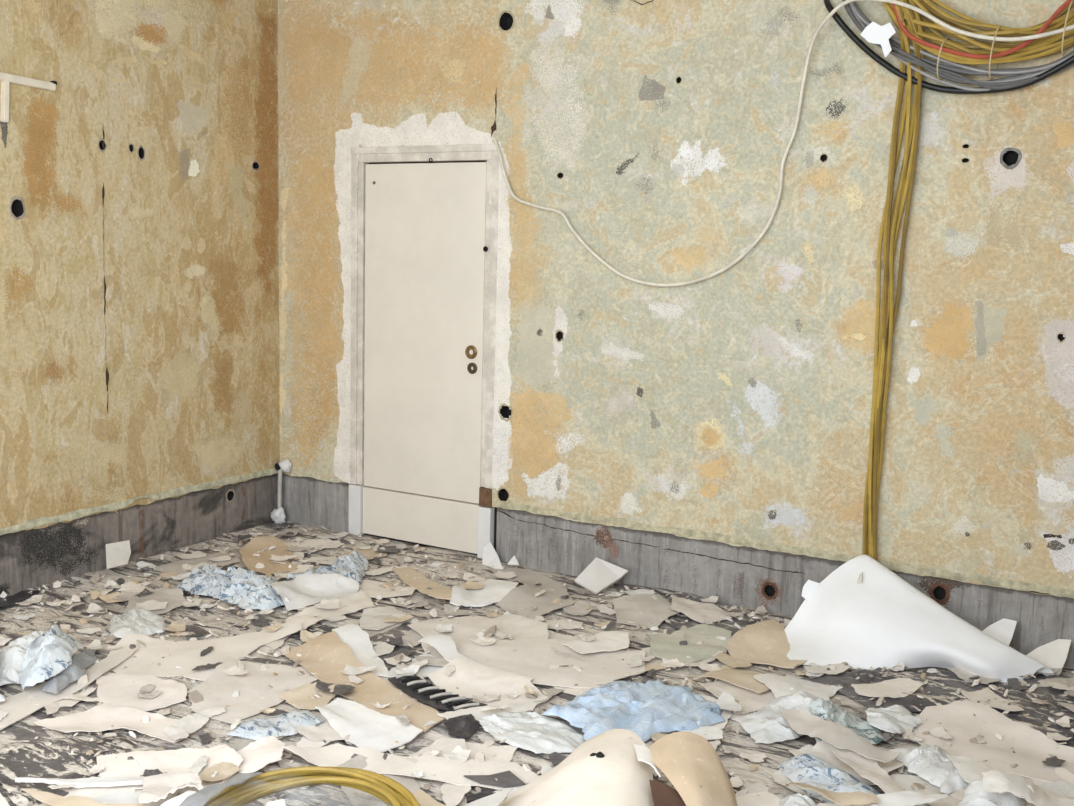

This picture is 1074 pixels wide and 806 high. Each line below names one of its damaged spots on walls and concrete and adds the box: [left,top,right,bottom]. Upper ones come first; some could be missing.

spalling [497,6,582,36]
peeling [616,139,727,188]
spalling [1060,241,1074,261]
peeling [1042,315,1074,410]
peeling [907,367,958,462]
spalling [492,403,857,562]
peeling [1037,453,1074,503]
water stain [17,522,106,578]
rust [592,526,620,560]
spalling [877,529,1074,605]